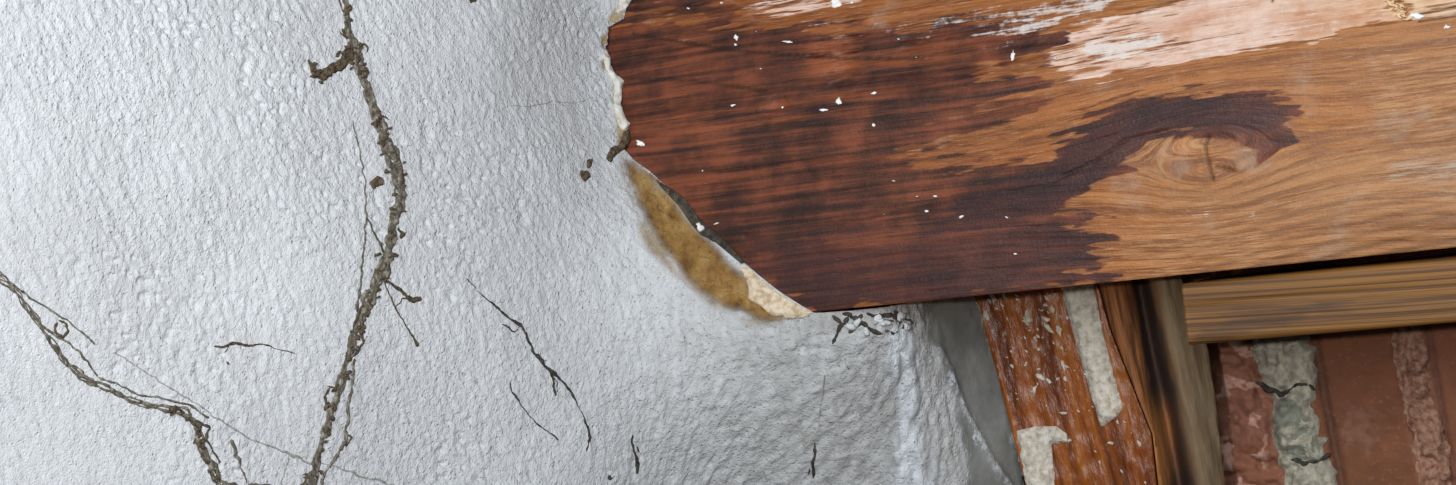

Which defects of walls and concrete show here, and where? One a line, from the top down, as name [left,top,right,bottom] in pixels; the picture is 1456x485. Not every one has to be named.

peeling [617,0,632,13]
peeling [603,52,645,146]
crack [0,0,422,485]
spalling [739,267,812,319]
crack [466,278,640,481]